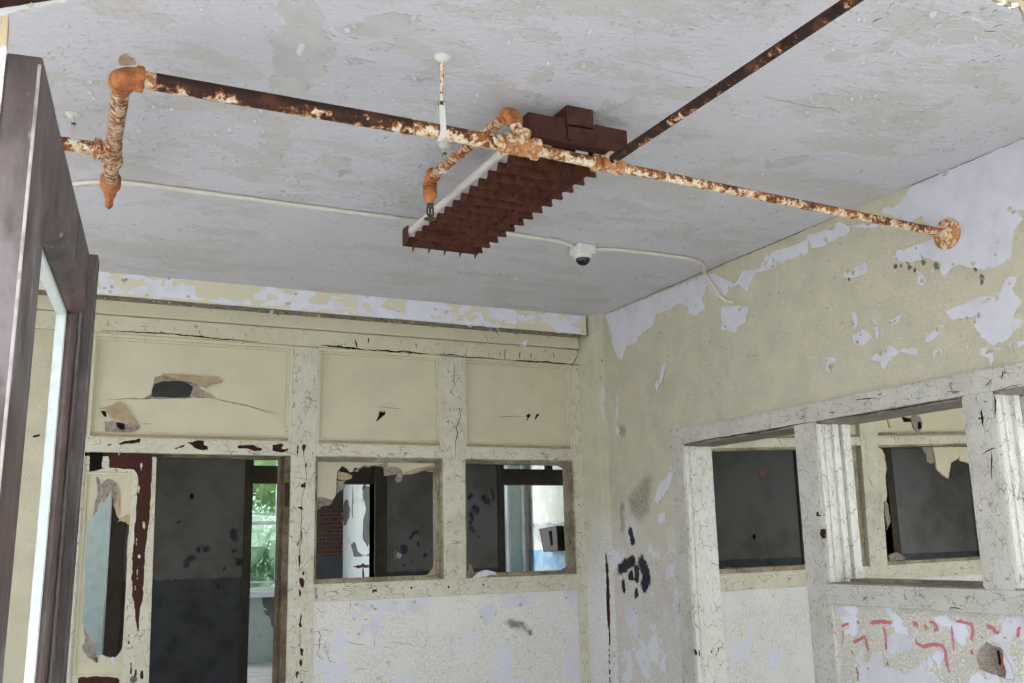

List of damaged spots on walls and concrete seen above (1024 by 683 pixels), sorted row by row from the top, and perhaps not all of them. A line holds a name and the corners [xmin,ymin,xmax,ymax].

crack [102,320,258,342]
peeling [100,277,537,329]
peeling [550,316,585,335]
peeling [601,139,1024,403]
crack [321,337,578,457]
crack [694,371,1023,443]
peeling [89,439,152,645]
peeling [977,618,1024,683]